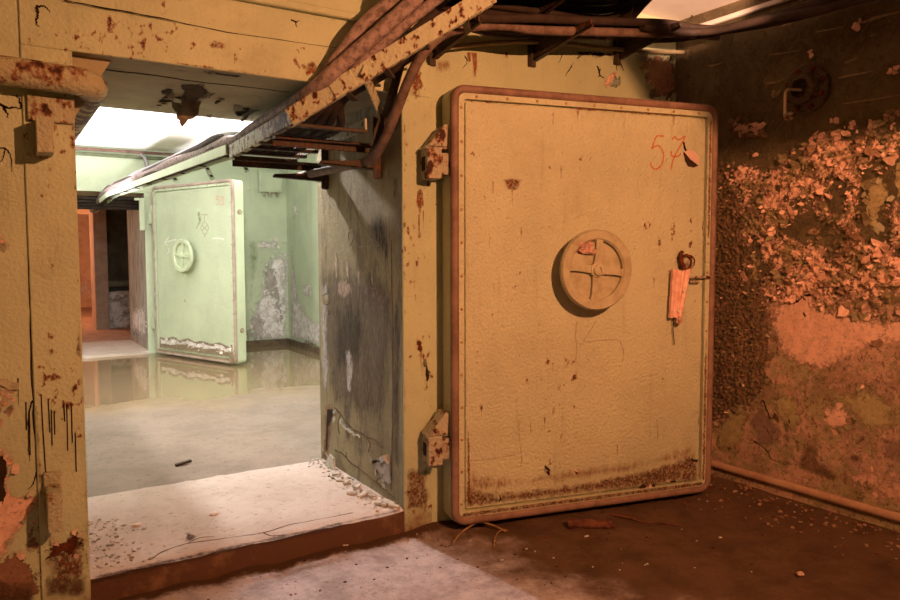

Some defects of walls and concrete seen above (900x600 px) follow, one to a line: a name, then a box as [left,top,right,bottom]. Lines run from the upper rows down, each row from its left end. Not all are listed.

peeling [157,70,261,127]
rust [413,71,423,96]
peeling [246,237,320,345]
peeling [712,108,900,435]
water stain [321,252,398,463]
spalling [370,454,394,491]
rust [408,469,427,507]
rust [463,356,707,517]
water stain [800,448,834,478]
spalling [0,448,85,598]
rust [53,540,82,584]